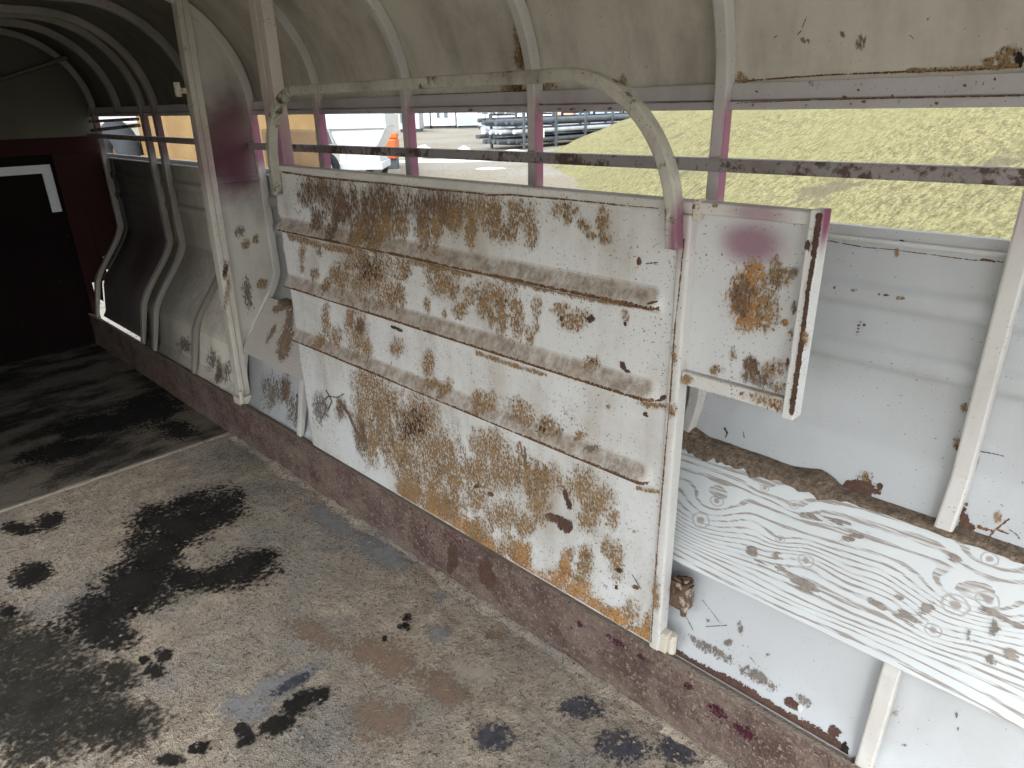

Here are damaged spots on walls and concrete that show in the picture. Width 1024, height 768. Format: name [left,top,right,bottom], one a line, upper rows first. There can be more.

corrosion [735,43,1024,106]
corrosion [234,226,259,249]
corrosion [222,261,231,314]
corrosion [721,254,798,412]
water stain [9,386,202,467]
corrosion [278,171,695,643]
peeling [842,471,883,496]
peeling [958,503,976,531]
water stain [0,481,284,768]
water stain [233,667,330,748]